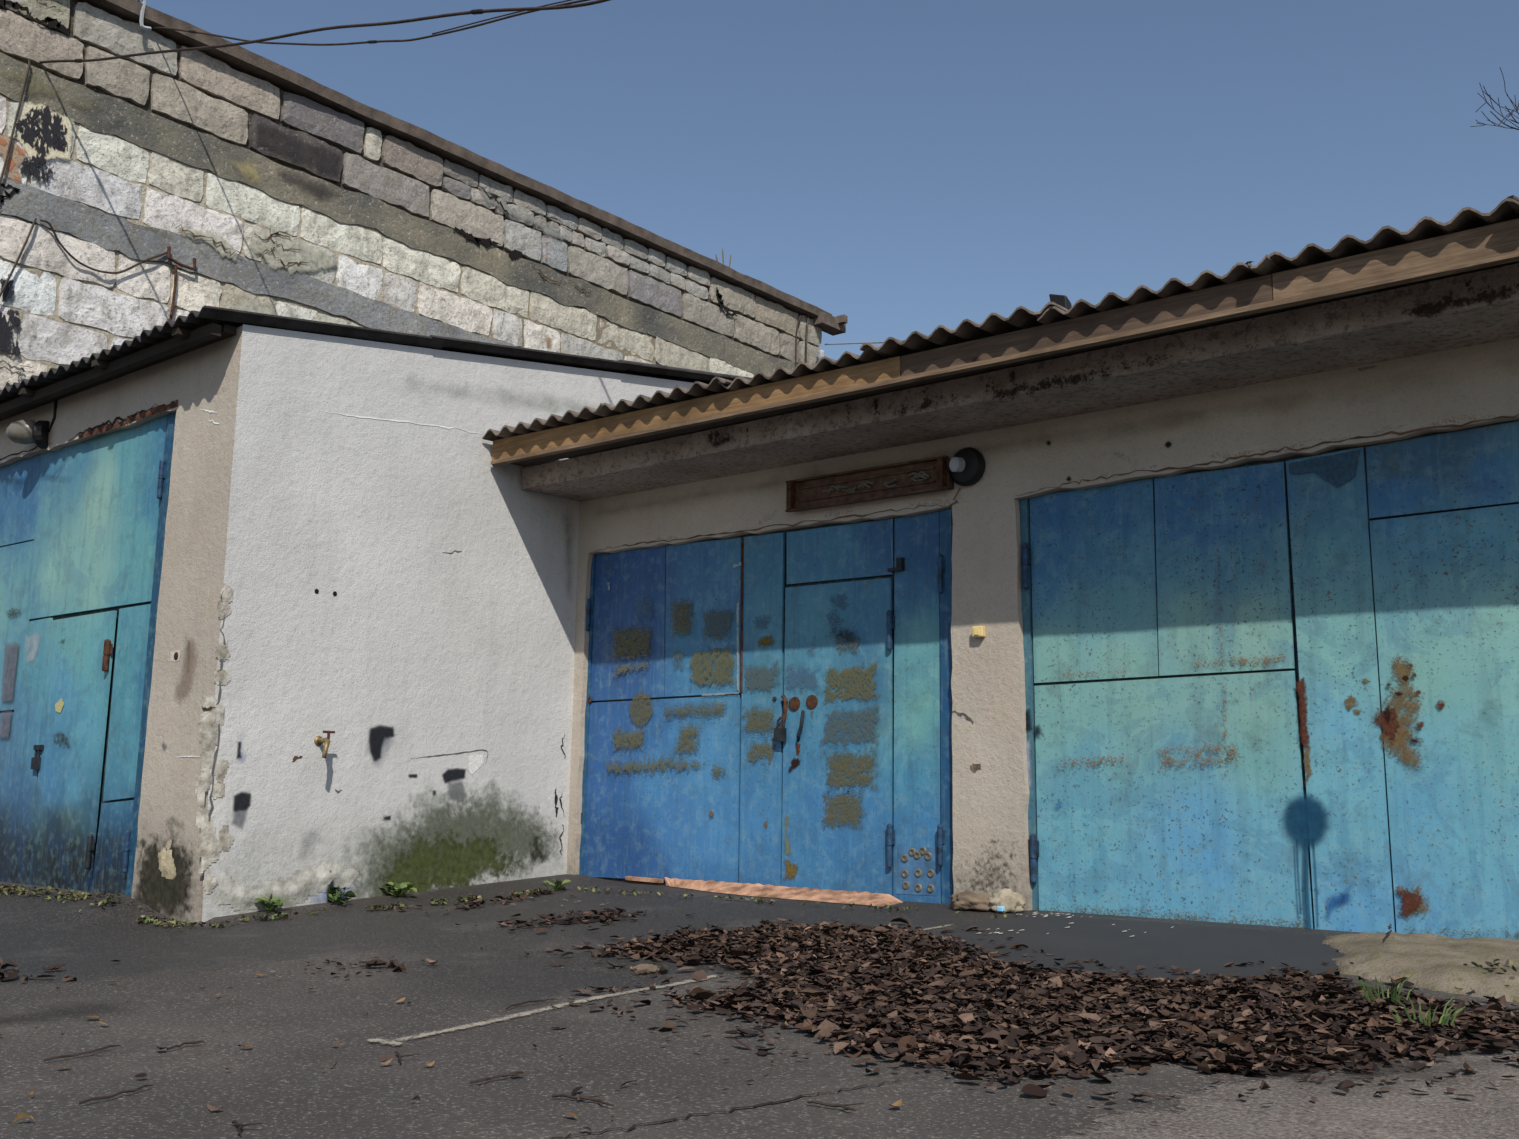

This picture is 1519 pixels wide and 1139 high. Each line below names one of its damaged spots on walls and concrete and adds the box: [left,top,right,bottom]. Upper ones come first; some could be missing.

peeling [0,101,73,183]
peeling [0,274,23,356]
flaking render [195,584,234,894]
rust [1296,678,1312,785]
rust [1345,656,1445,768]
water stain [365,769,555,897]
water stain [136,839,192,917]
water stain [316,880,346,903]
rust [1396,886,1430,919]